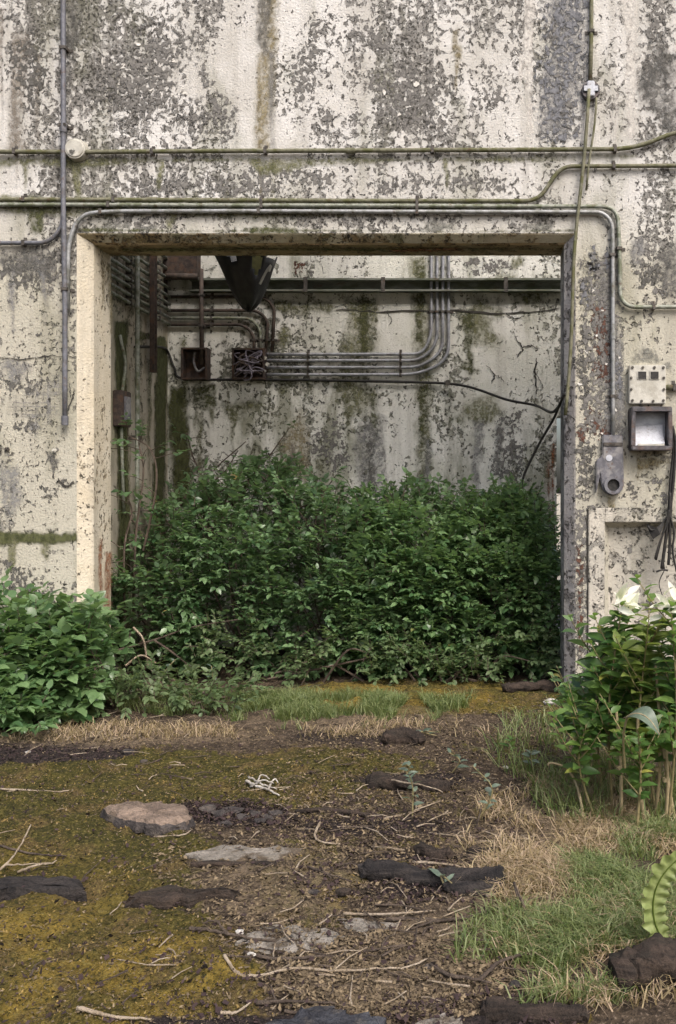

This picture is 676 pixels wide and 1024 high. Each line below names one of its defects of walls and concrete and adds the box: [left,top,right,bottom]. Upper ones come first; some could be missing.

peeling [87,3,242,145]
leakage [255,0,277,148]
peeling [288,15,459,136]
peeling [133,163,337,198]
peeling [368,169,534,198]
leakage [415,294,424,342]
crack [336,308,558,394]
leakage [460,310,479,373]
peeling [3,323,78,517]
leakage [356,390,384,507]
peeling [568,239,668,688]
leakage [0,531,77,566]